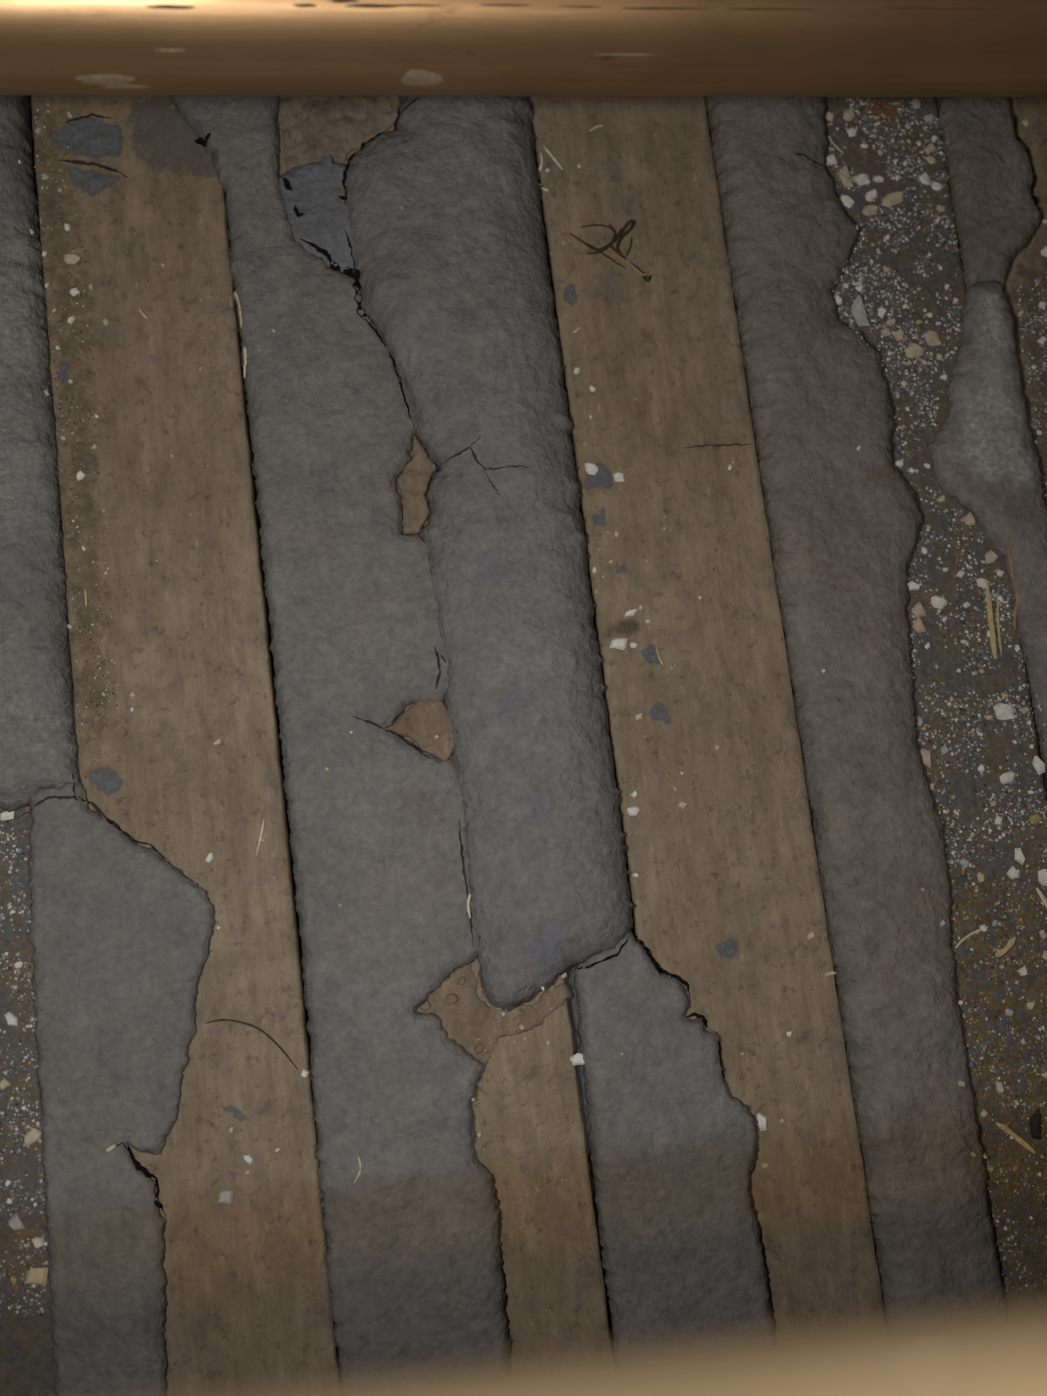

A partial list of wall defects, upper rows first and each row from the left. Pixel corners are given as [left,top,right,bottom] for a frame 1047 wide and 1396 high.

spalling [839,165,905,216]
crack [283,97,419,429]
spalling [397,435,438,534]
spalling [931,596,947,609]
spalling [384,700,455,760]
spalling [993,703,1015,720]
spalling [1032,756,1045,775]
spalling [0,811,14,834]
spalling [1007,848,1047,886]
spalling [416,963,571,1066]
spalling [570,1053,585,1065]
spalling [24,1268,48,1286]